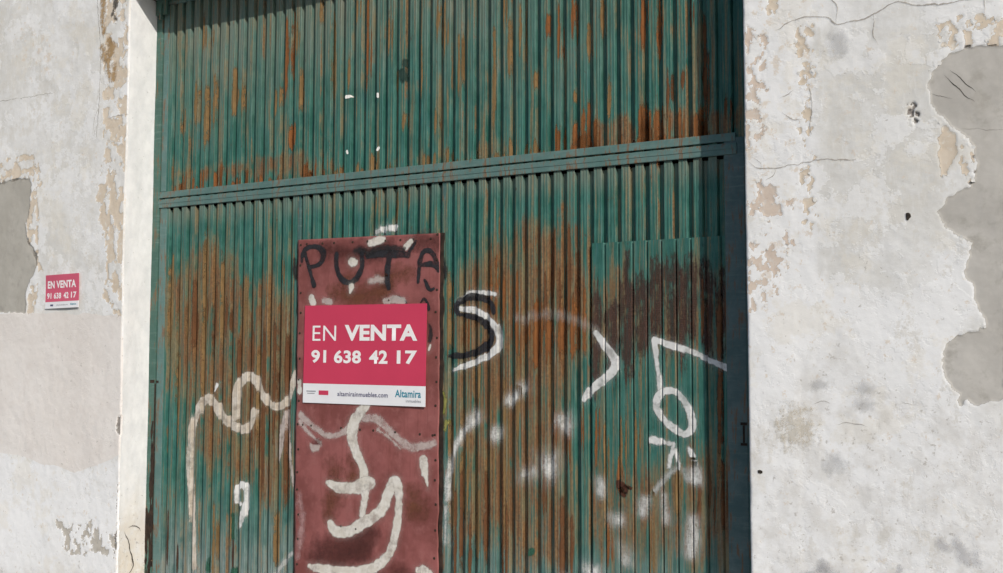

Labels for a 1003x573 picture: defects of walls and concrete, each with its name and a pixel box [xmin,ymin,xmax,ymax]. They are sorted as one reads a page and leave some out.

flaking render [0,154,43,314]
peeling [95,0,128,316]
corrosion [275,12,305,116]
corrosion [525,77,611,154]
corrosion [621,0,720,144]
peeling [744,26,769,150]
peeling [747,155,819,230]
crack [775,0,985,42]
flaking render [927,13,1003,406]
corrosion [166,235,292,573]
corrosion [447,224,728,573]
peeling [54,519,117,559]